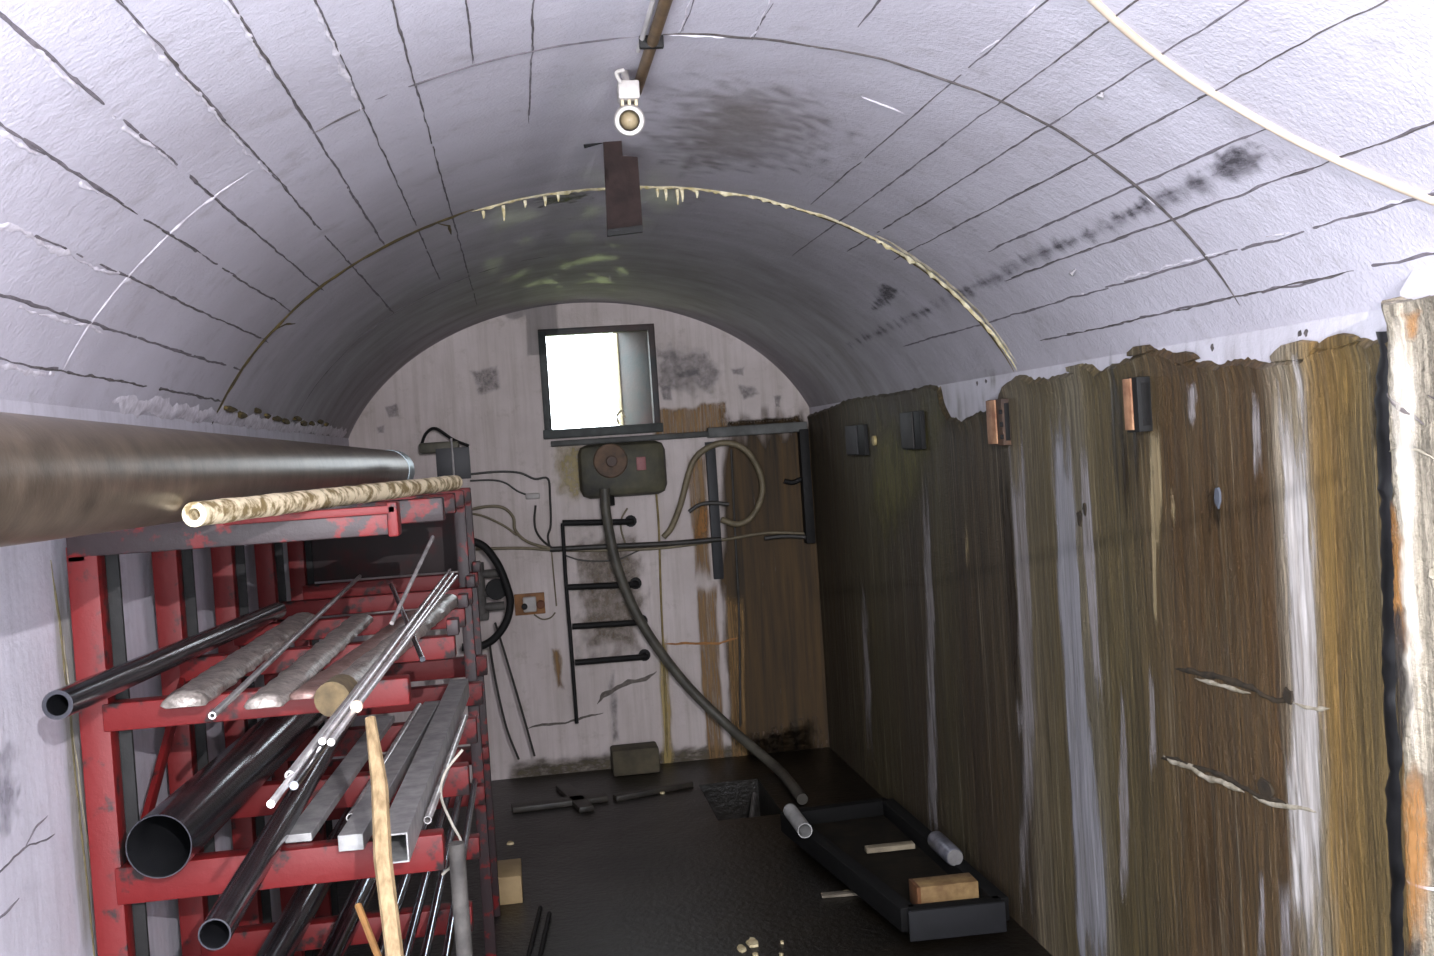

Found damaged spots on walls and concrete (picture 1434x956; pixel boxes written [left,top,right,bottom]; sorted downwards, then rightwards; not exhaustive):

damp [472,188,605,221]
crack [0,0,1434,424]
damp [640,186,1434,956]
crack [1176,667,1331,712]
damp [513,756,612,778]
crack [1160,755,1317,813]